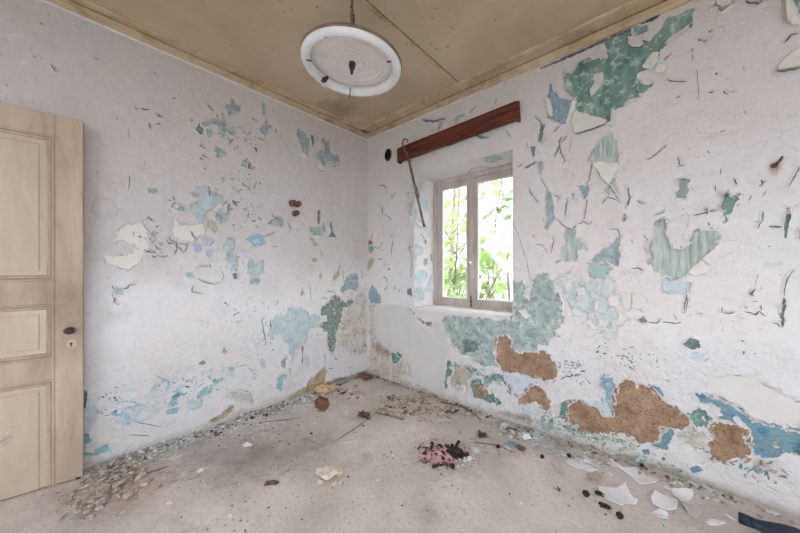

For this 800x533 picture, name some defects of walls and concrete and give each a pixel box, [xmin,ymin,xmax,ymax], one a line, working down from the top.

peeling [100,98,297,300]
peeling [84,208,390,461]
peeling [405,0,800,510]